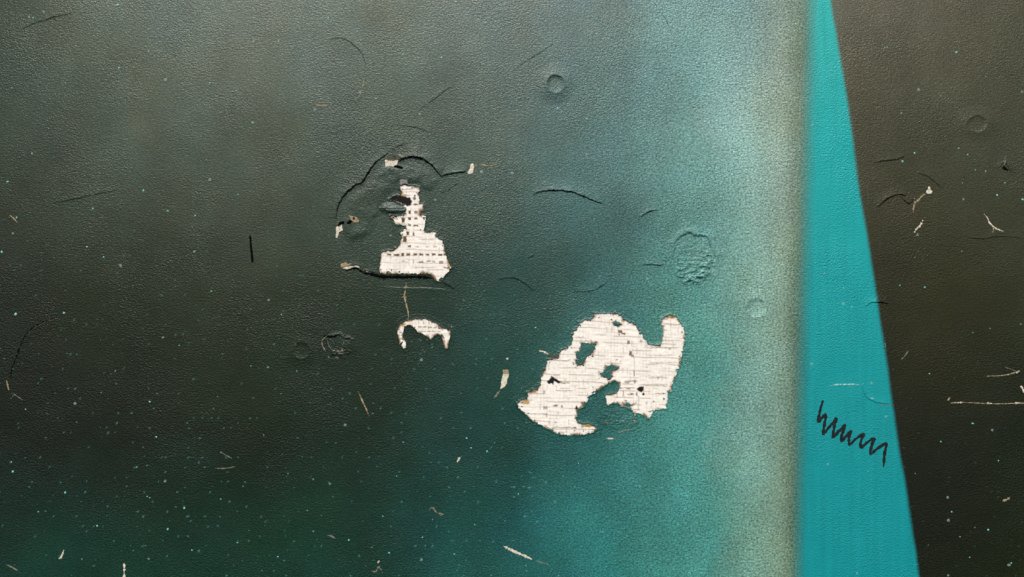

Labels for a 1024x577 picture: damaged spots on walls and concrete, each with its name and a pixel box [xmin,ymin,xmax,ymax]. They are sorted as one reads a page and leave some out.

crack [316,126,468,244]
peeling [336,154,457,354]
crack [439,276,459,290]
crack [530,174,606,204]
crack [871,182,932,233]
peeling [510,306,692,442]